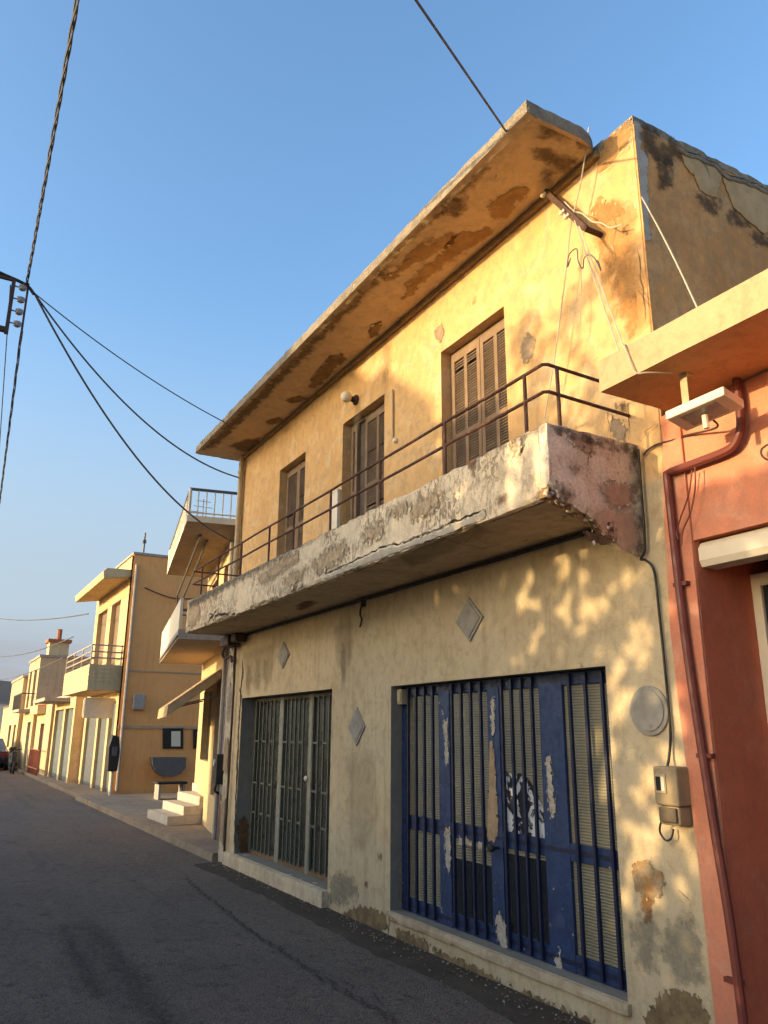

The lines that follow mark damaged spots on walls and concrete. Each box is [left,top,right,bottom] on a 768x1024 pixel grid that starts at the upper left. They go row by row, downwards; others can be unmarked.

leakage [641,125,682,189]
crack [681,149,768,194]
peeling [384,187,529,300]
leakage [697,194,768,247]
peeling [519,332,536,364]
peeling [285,353,348,404]
peeling [608,404,627,442]
spalling [537,430,637,546]
peeling [361,488,444,548]
peeling [257,539,349,593]
peeling [632,859,666,922]
spalling [643,988,711,1024]